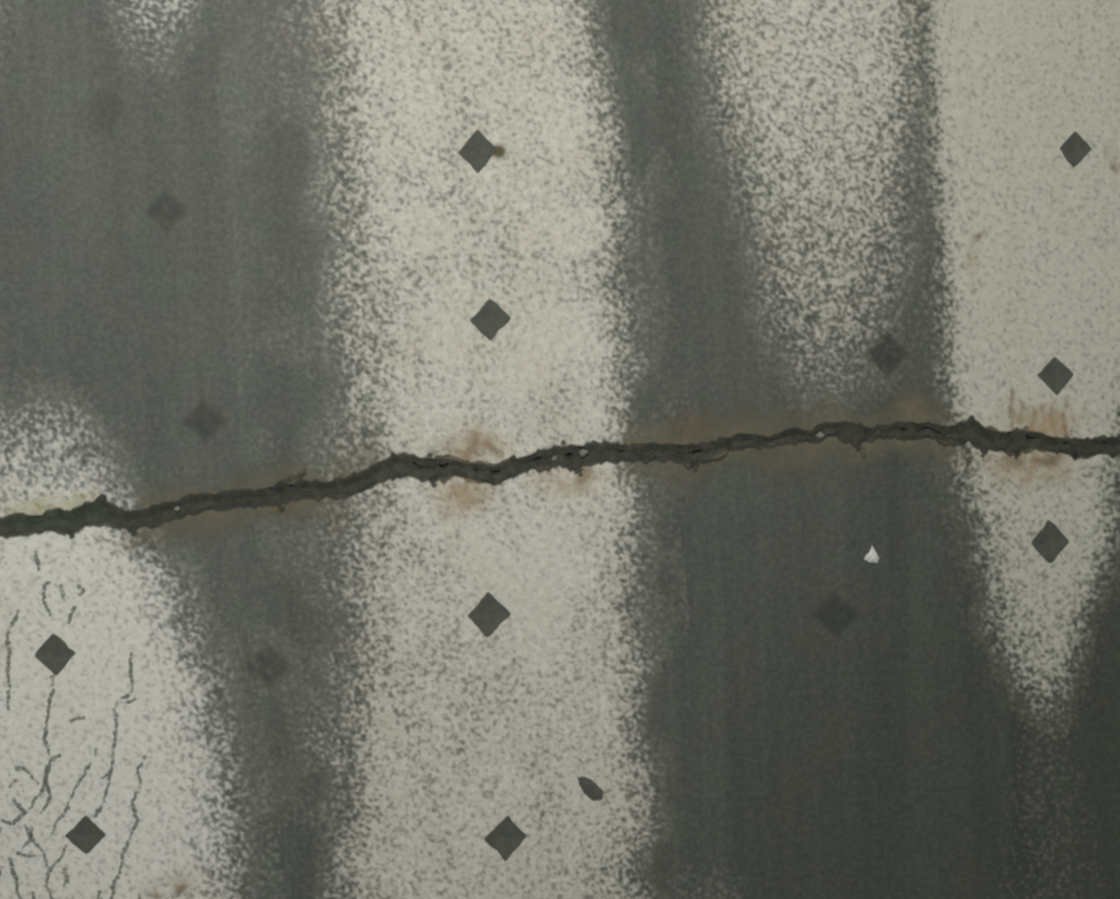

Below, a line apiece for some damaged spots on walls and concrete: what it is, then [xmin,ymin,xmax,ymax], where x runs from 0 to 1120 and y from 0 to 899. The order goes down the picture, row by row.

crack [0,415,1120,623]
crack [5,614,18,709]
crack [0,653,146,899]